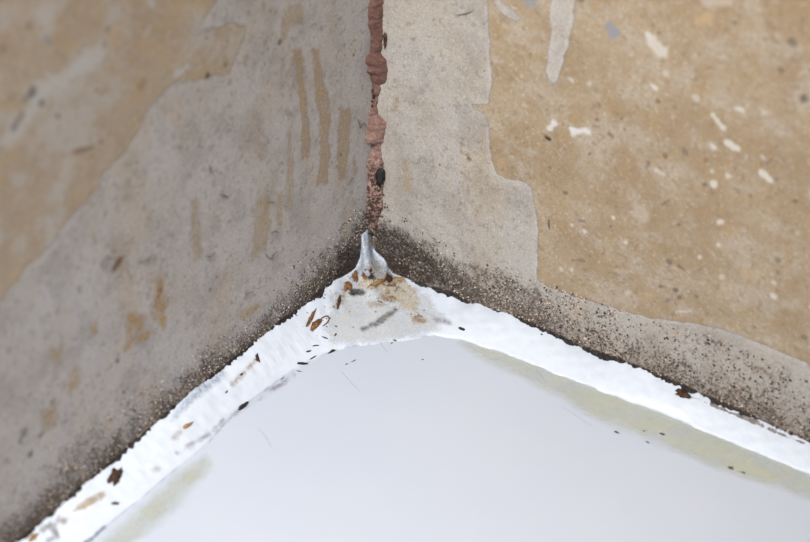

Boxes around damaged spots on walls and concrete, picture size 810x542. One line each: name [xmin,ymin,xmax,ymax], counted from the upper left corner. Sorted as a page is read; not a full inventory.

peeling [0,0,373,542]
damp [254,49,310,250]
damp [313,50,355,185]
damp [0,191,810,542]
peeling [369,0,810,438]